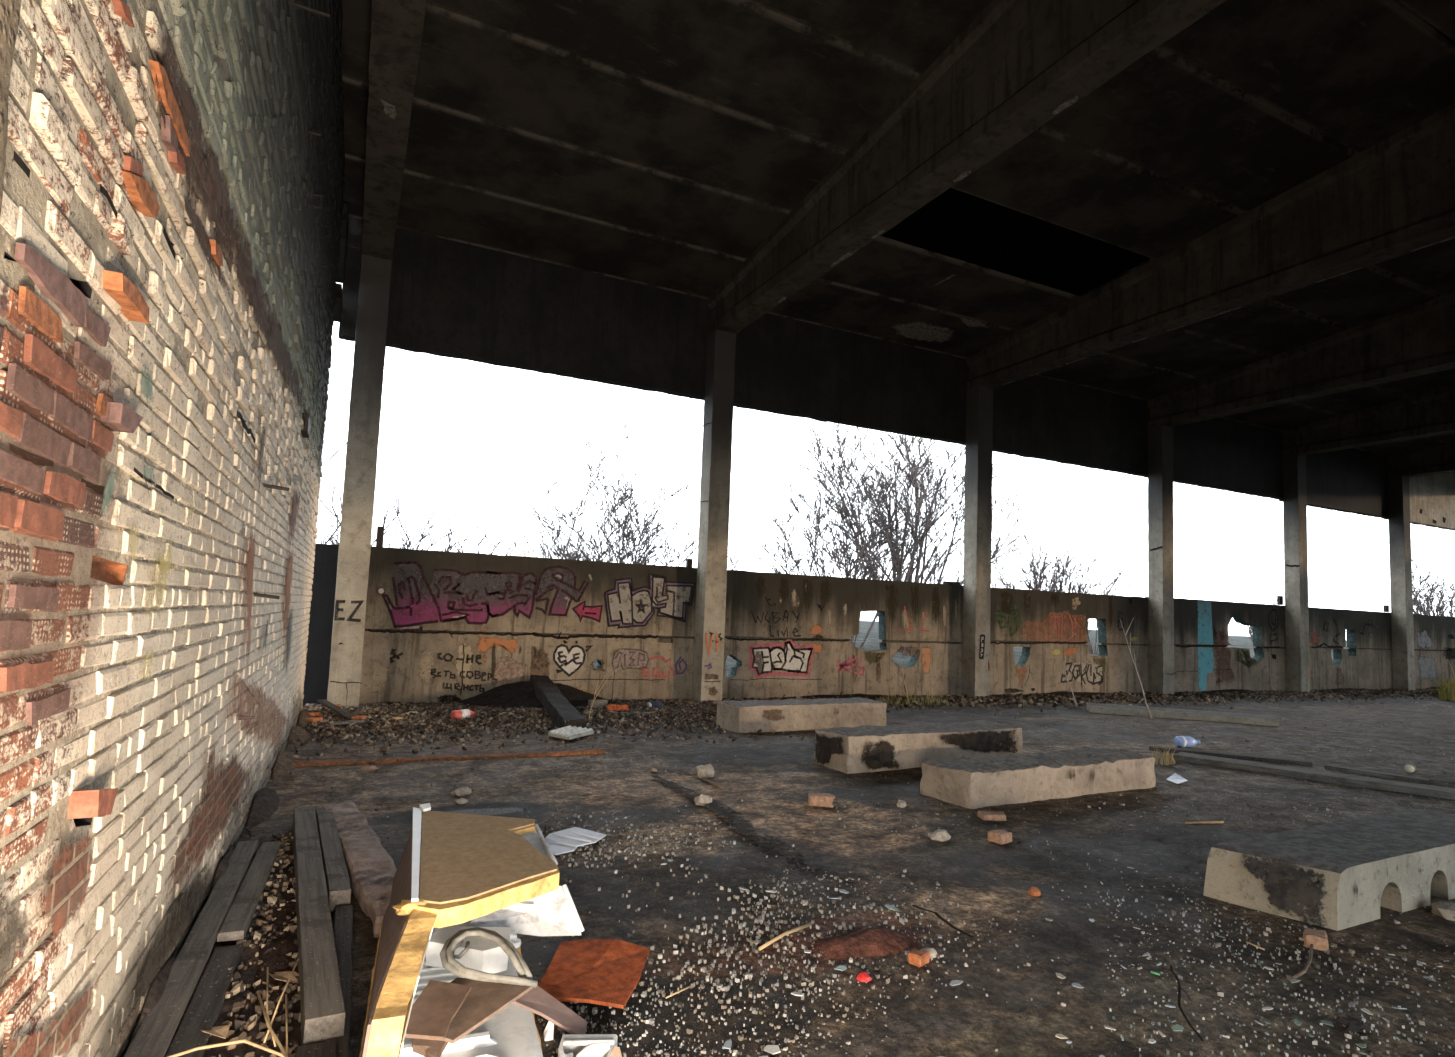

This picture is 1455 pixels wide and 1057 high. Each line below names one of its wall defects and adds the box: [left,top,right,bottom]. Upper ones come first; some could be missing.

spalling [121,155,160,218]
spalling [148,32,311,433]
peeling [0,242,149,540]
spalling [90,555,128,586]
peeling [0,584,71,725]
spalling [231,676,288,748]
spalling [163,748,249,897]
leakage [0,896,28,993]